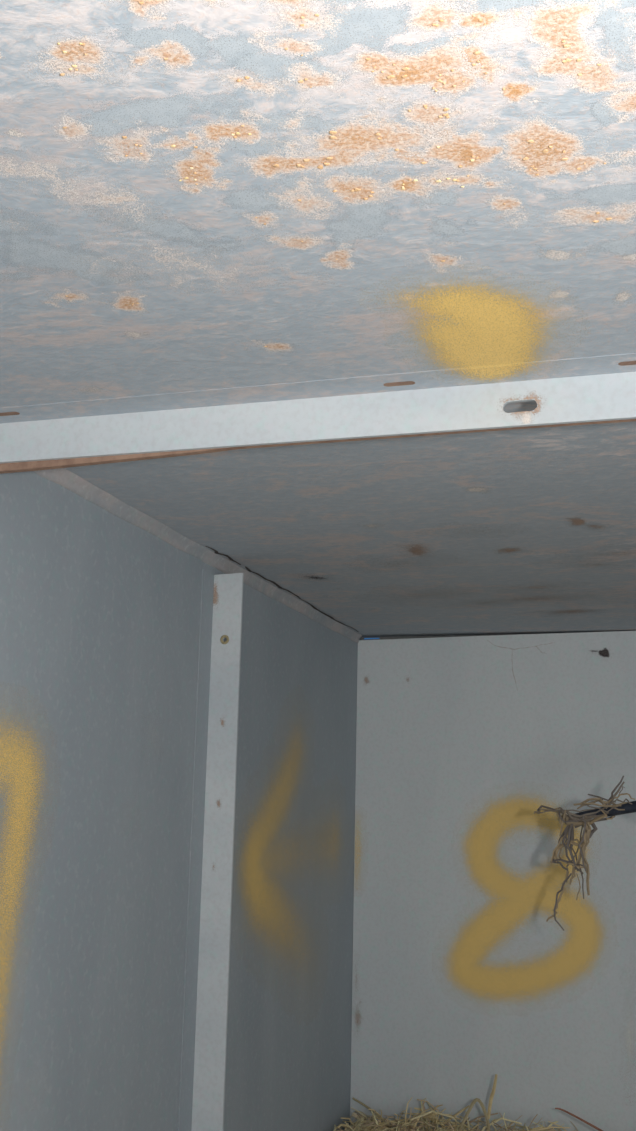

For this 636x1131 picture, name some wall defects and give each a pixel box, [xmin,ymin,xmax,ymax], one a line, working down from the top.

rust [27,0,636,270]
rust [42,286,148,316]